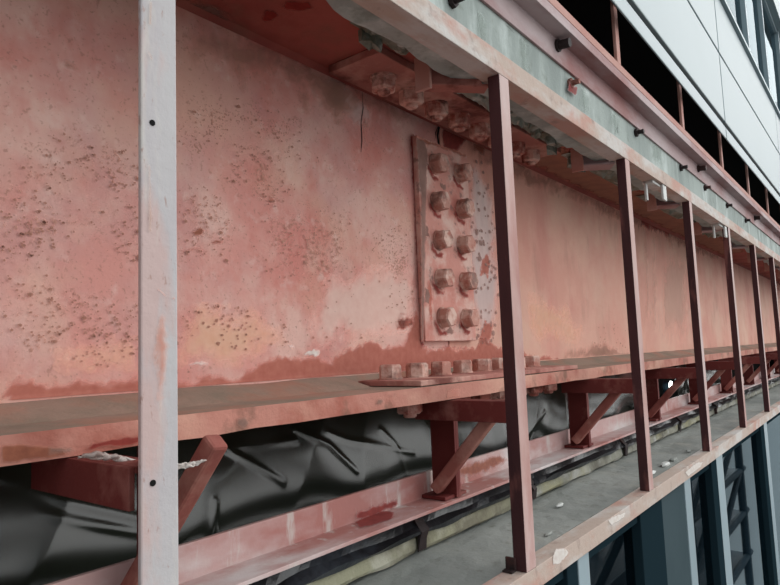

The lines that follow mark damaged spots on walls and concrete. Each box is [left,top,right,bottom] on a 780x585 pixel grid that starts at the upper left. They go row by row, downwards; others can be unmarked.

spalling [457,93,489,111]
spalling [510,110,571,168]
corrosion [1,132,138,261]
corrosion [179,186,235,262]
peeling [177,160,503,388]
corrosion [8,275,115,343]
peeling [5,381,138,400]
peeling [553,549,568,564]